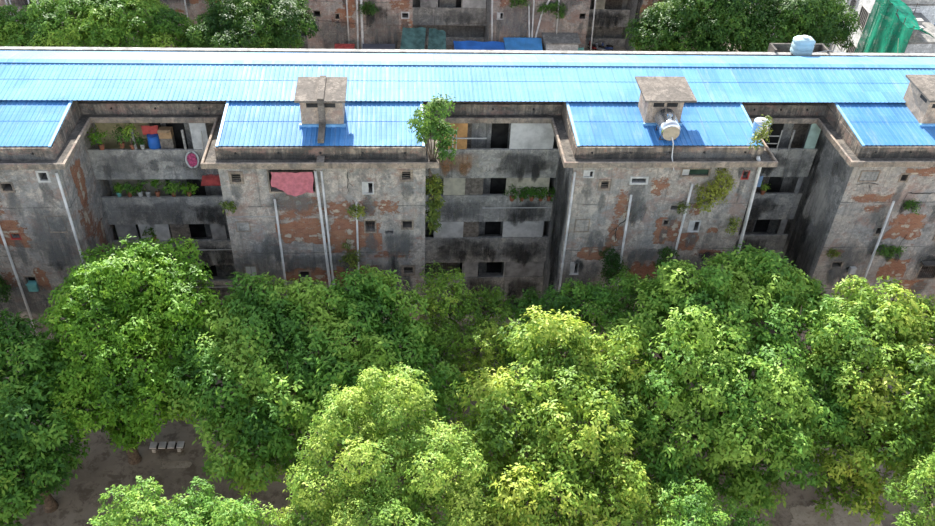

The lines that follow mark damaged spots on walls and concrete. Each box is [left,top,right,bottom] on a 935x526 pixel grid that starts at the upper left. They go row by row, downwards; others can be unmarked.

flaking render [331,0,356,28]
leakage [589,12,623,28]
flaking render [0,201,33,248]
flaking render [275,195,410,287]
leakage [439,154,598,298]
flaking render [577,189,636,260]
flaking render [652,217,725,256]
leakage [734,239,765,251]
leakage [743,199,777,222]
leakage [453,279,536,303]
flaking render [876,258,927,293]